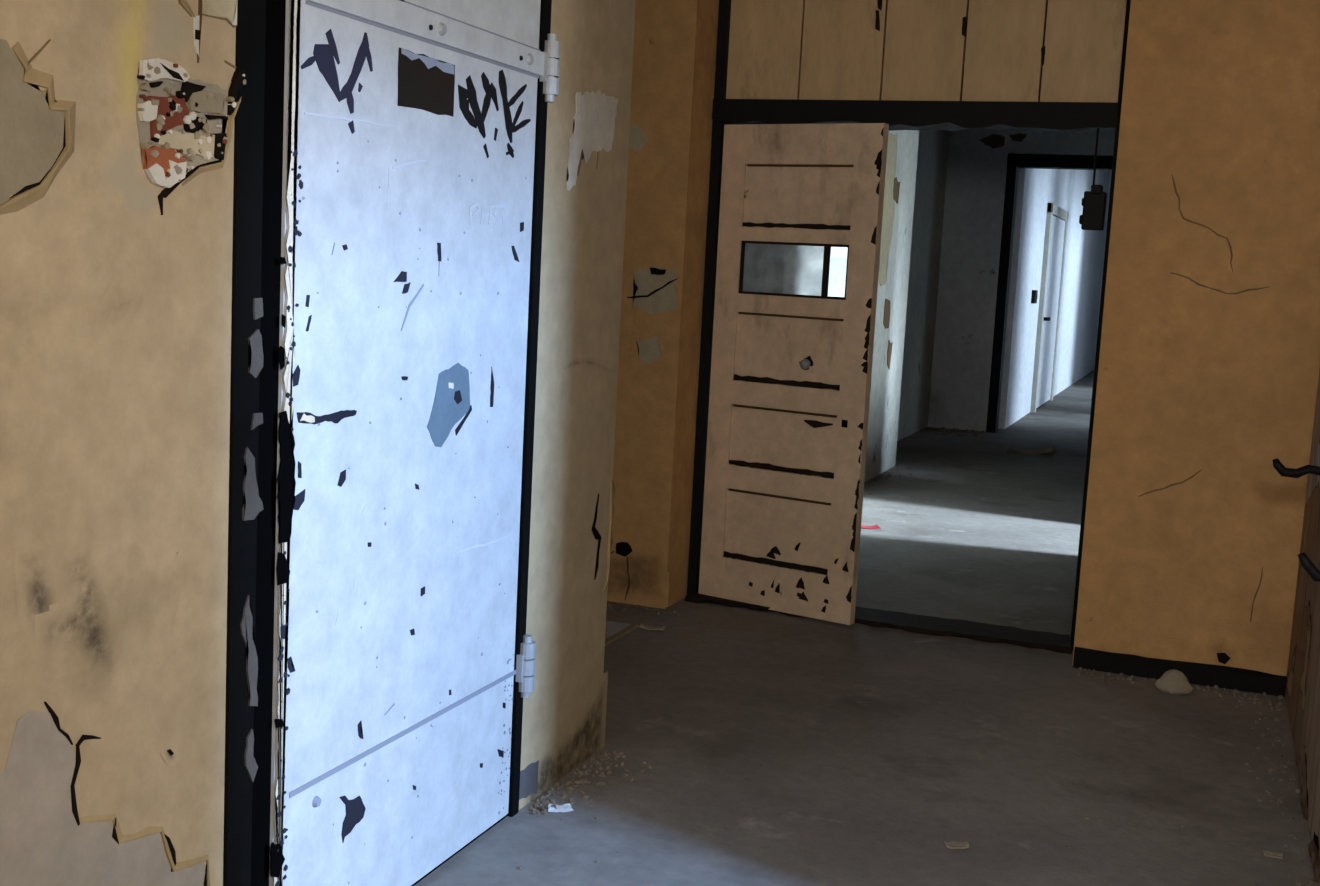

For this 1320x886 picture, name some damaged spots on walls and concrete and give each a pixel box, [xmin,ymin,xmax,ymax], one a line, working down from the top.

peeling [0,39,76,215]
flaking render [136,0,247,215]
peeling [566,89,618,191]
flaking render [1285,372,1320,885]
peeling [0,711,210,886]